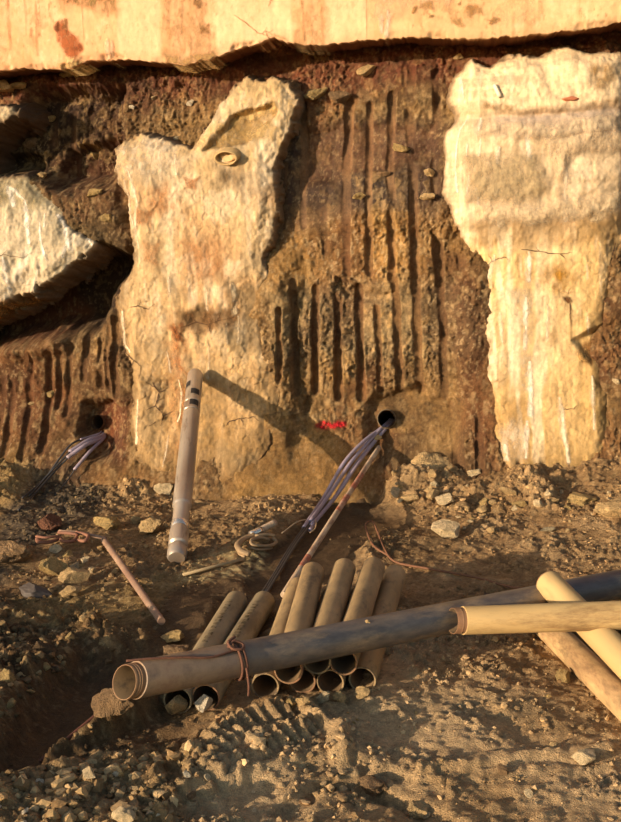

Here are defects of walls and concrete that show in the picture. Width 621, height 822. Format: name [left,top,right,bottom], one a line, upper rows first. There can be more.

crack [122,339,171,426]